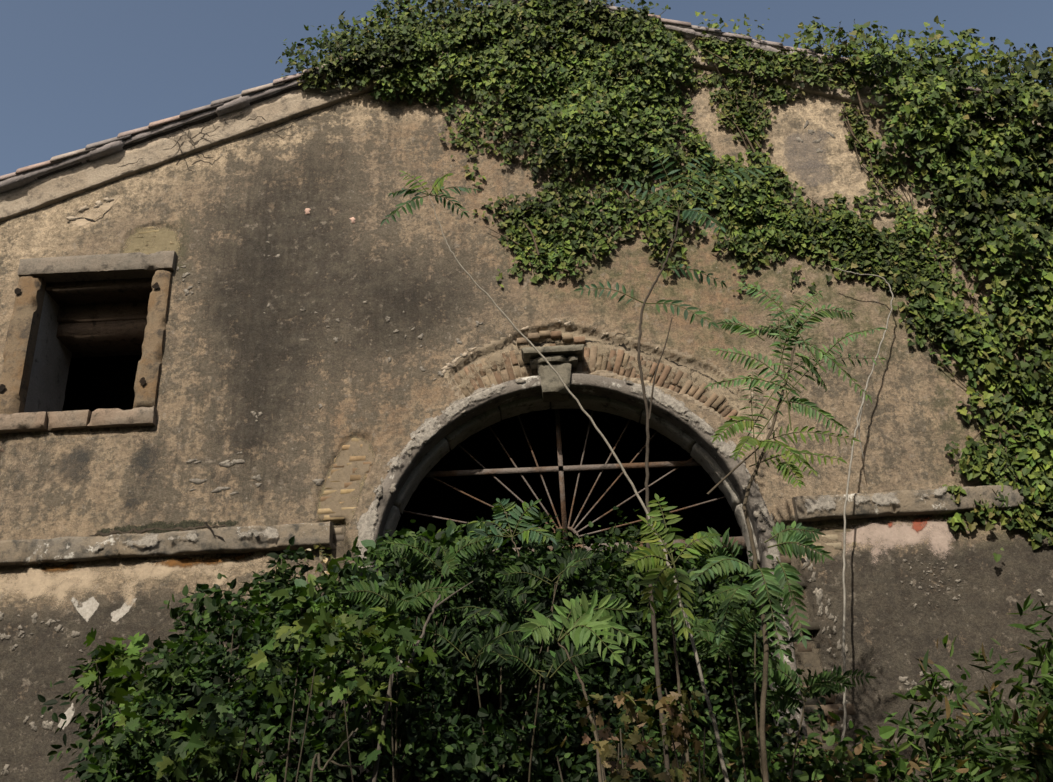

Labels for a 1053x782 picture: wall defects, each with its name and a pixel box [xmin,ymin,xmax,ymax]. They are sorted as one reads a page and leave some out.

crack [119,111,310,173]
crack [67,207,112,223]
peeling [219,452,245,468]
spalling [313,320,778,582]
peeling [0,597,99,653]
peeling [111,598,137,622]
spalling [753,501,857,767]